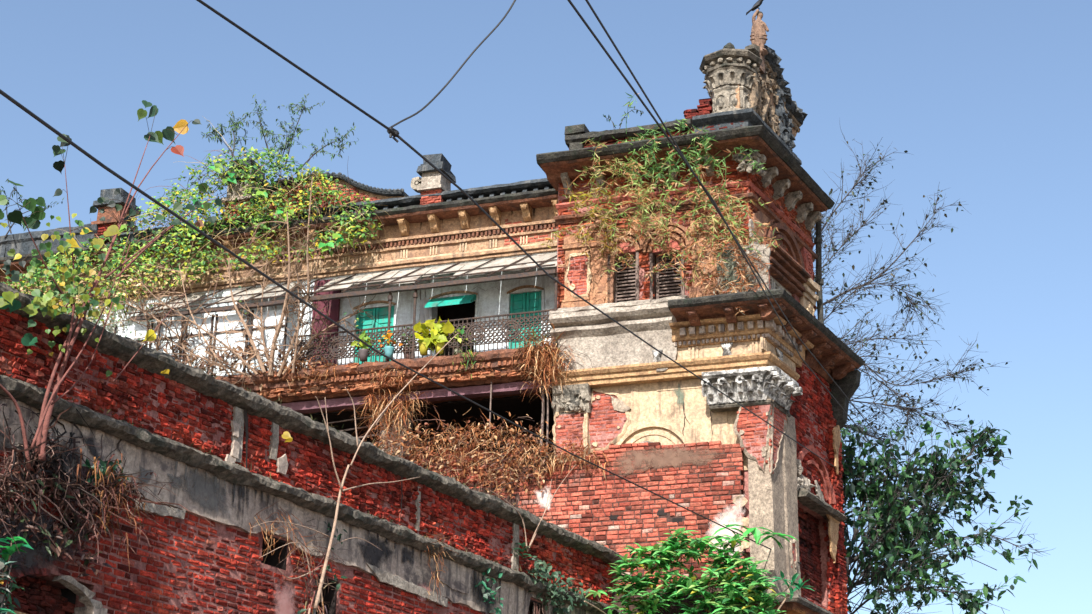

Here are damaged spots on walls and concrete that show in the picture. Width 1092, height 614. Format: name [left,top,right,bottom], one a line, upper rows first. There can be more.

spalling [0,309,613,608]
spalling [552,388,631,459]
spalling [733,399,788,475]
peeling [832,425,841,474]
peeling [800,474,825,501]
damp [358,531,431,568]
peeling [826,514,840,563]